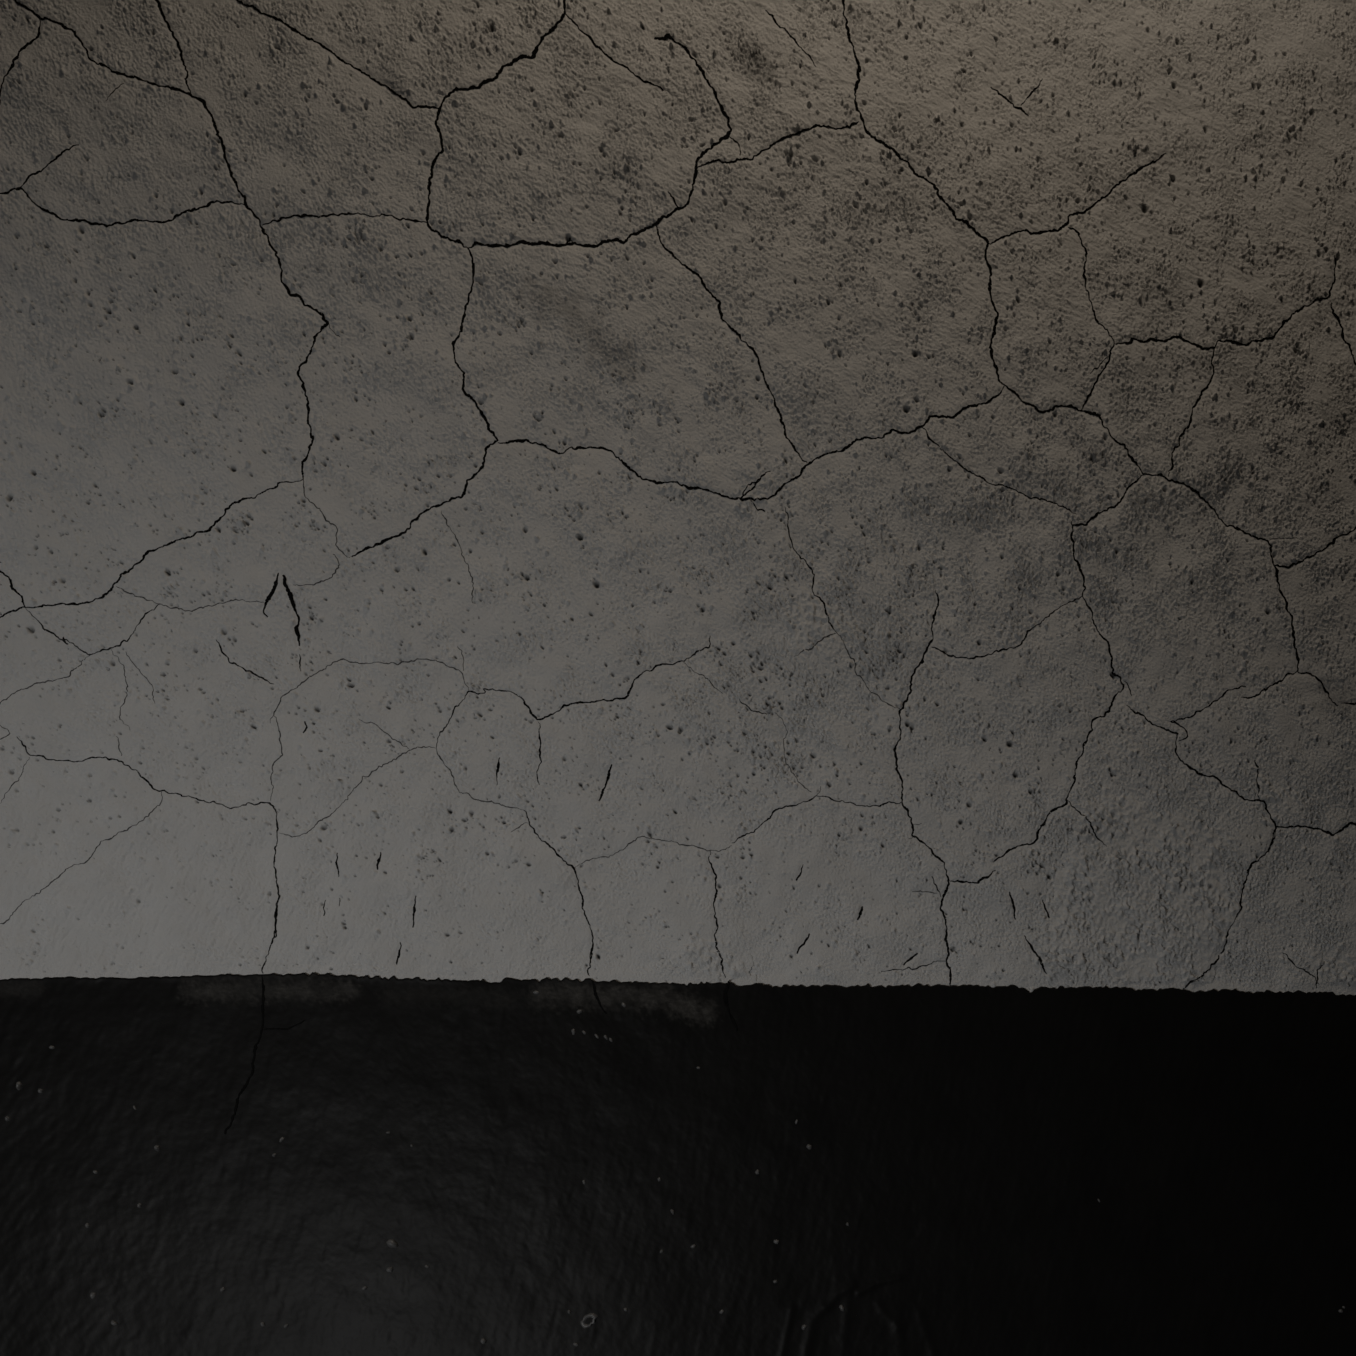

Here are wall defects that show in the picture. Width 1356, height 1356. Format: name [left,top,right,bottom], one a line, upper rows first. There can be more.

crack [0,638,723,1135]
crack [0,0,1356,1031]